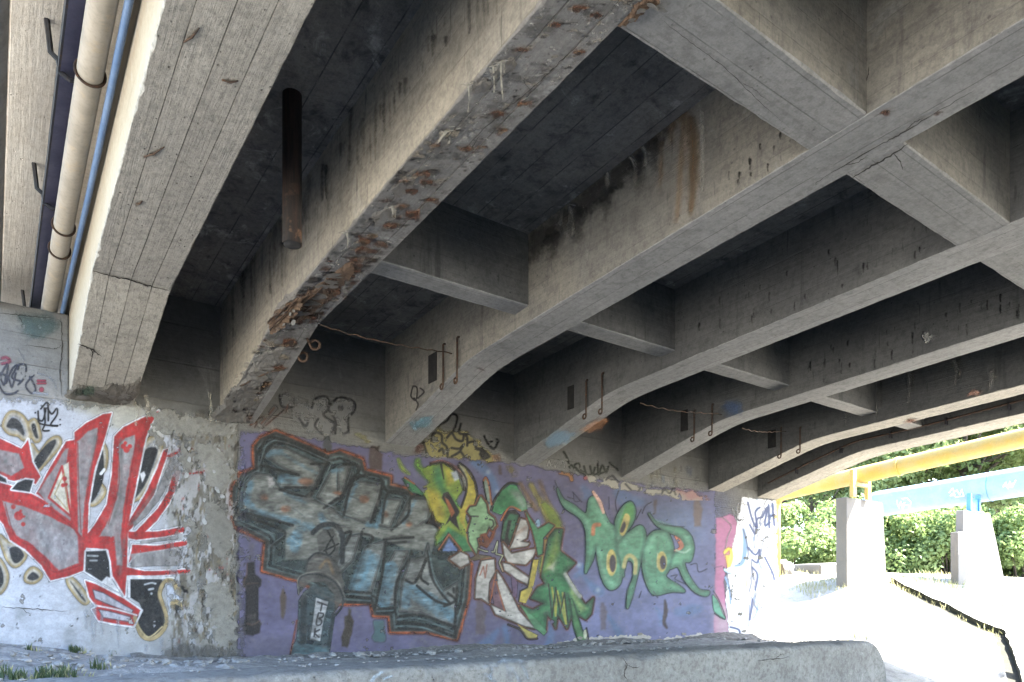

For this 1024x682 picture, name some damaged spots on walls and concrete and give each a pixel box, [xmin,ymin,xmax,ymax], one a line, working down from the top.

crack [815,93,969,184]
crack [94,271,169,291]
flaking render [145,0,668,561]
spalling [64,377,141,405]
flaking render [192,578,239,654]